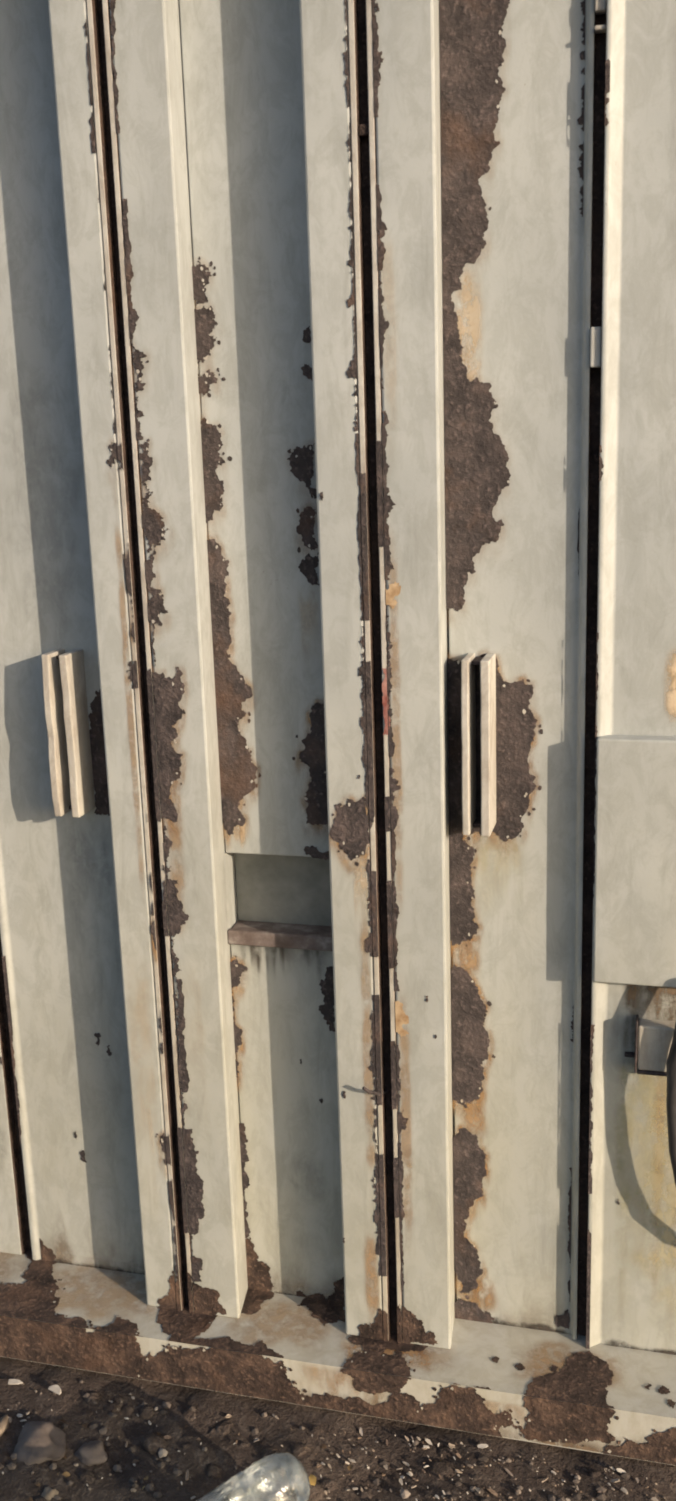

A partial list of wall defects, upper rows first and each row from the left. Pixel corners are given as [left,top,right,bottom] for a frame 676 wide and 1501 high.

rust [88,690,110,816]
rust [106,346,124,471]
rust [122,198,186,822]
rust [192,257,226,397]
rust [201,417,261,841]
rust [287,443,319,585]
rust [292,0,401,991]
rust [439,0,511,611]
rust [666,654,676,717]
rust [0,826,676,1465]
rust [447,654,543,1324]